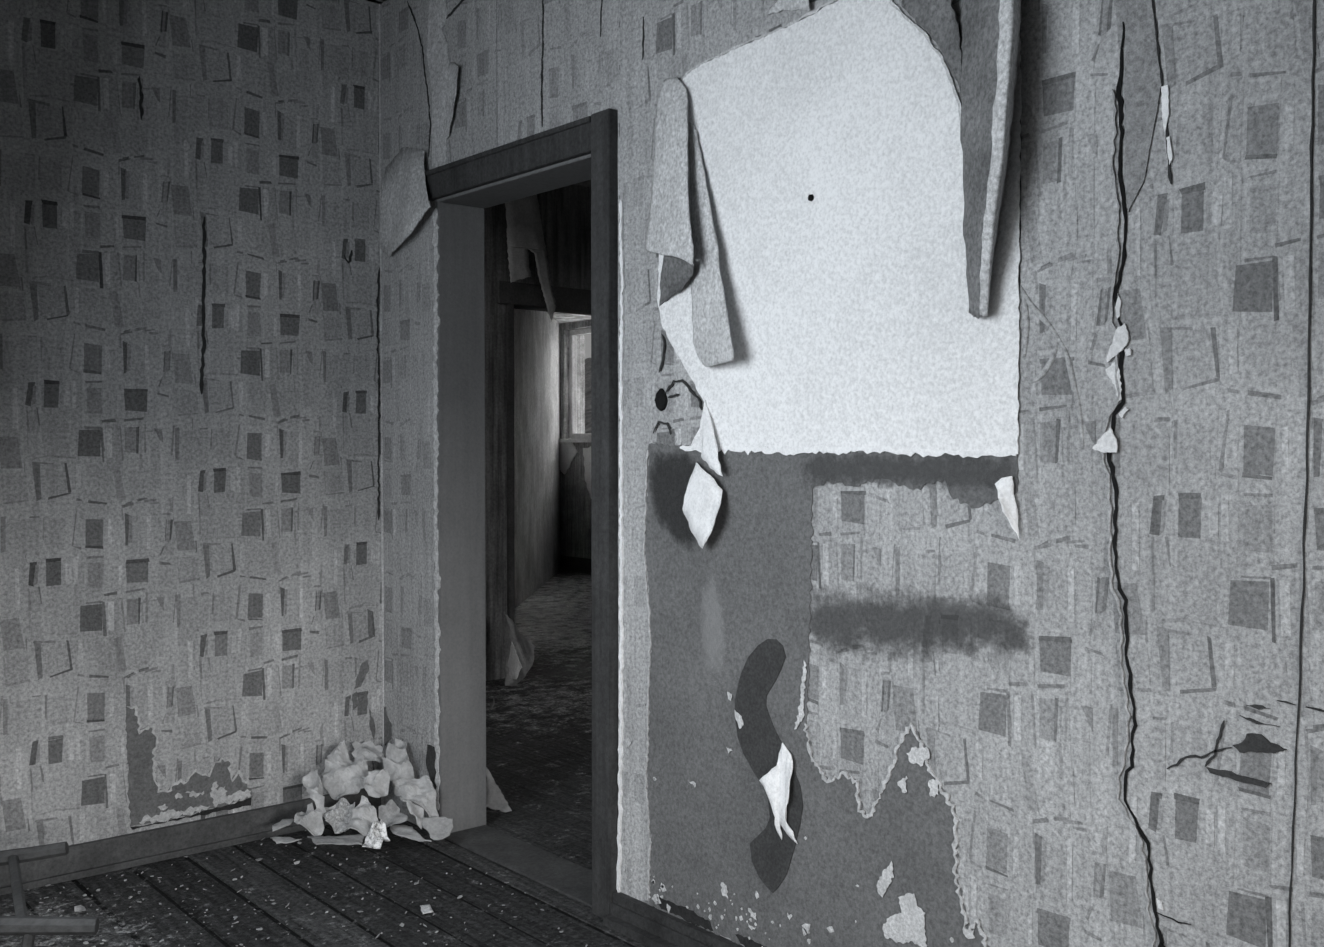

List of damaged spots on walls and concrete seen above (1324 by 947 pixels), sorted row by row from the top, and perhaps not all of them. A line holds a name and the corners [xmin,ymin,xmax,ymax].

peeling [407,0,464,167]
peeling [616,0,1022,947]
crack [1092,0,1191,947]
damp [809,597,1026,655]
peeling [125,705,253,830]